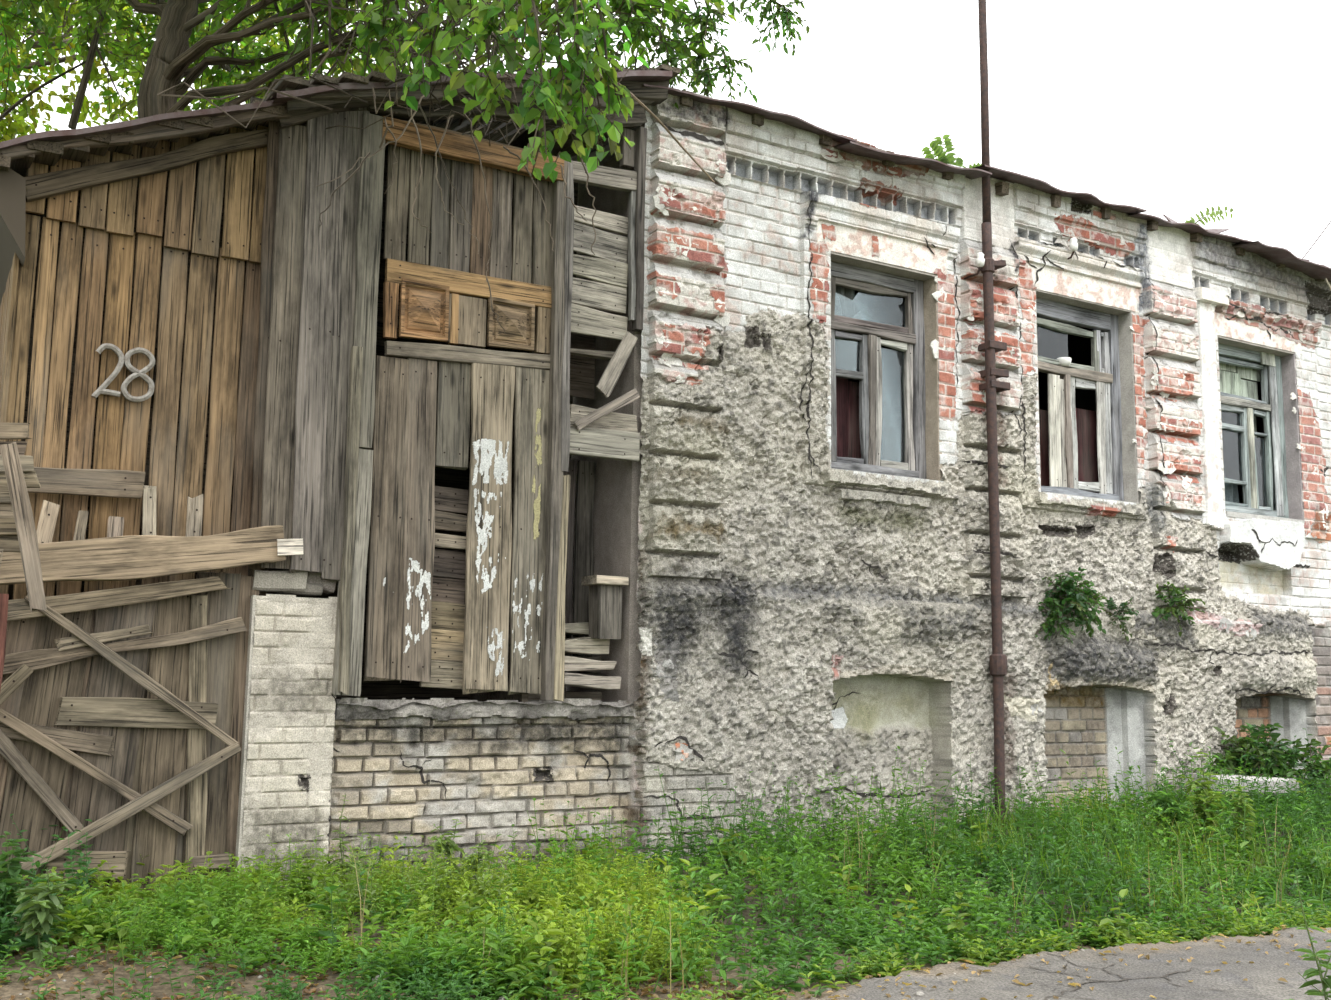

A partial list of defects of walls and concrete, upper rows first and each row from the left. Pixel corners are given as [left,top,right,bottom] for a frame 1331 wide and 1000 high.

peeling [472,438,509,593]
peeling [488,574,543,677]
peeling [646,185,730,385]
crack [799,191,819,483]
peeling [930,259,1037,421]
crack [963,241,1166,526]
peeling [1129,285,1203,506]
crack [1252,529,1310,568]
peeling [1290,389,1331,544]
crack [655,736,705,762]